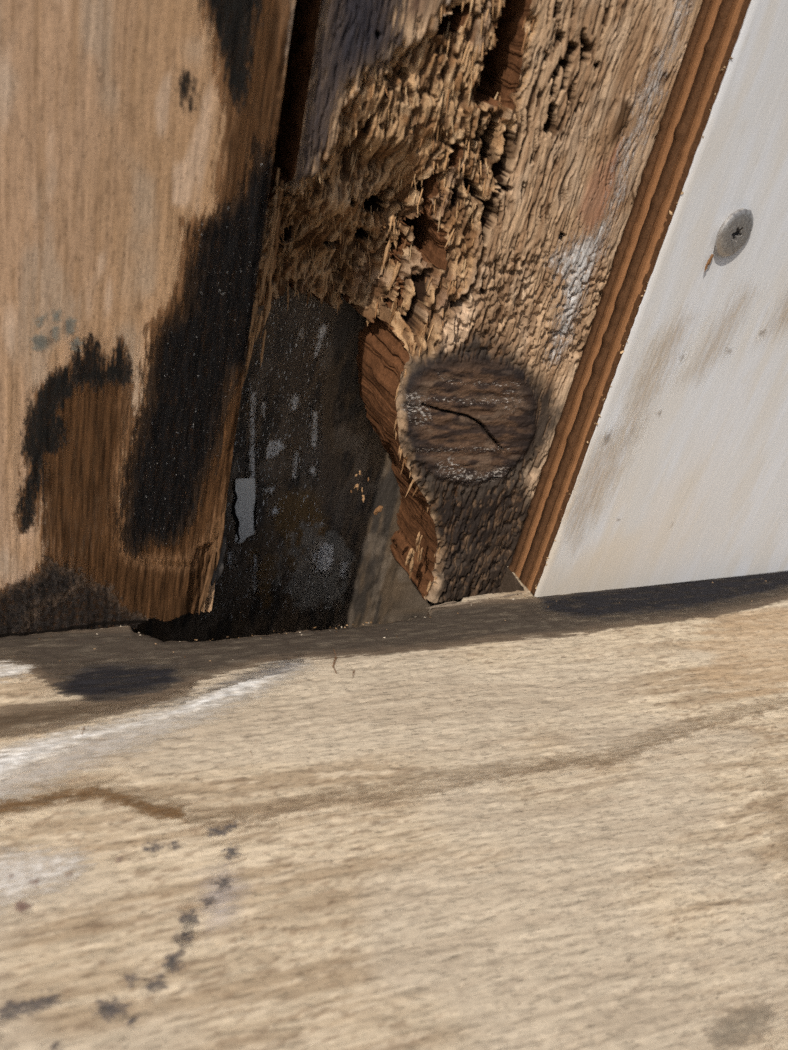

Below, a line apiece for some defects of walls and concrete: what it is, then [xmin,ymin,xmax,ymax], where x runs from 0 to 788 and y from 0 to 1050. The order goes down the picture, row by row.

spalling [267,0,321,208]
spalling [436,2,473,35]
spalling [473,0,532,110]
spalling [311,143,464,601]
water stain [0,0,788,823]
crack [424,404,500,448]